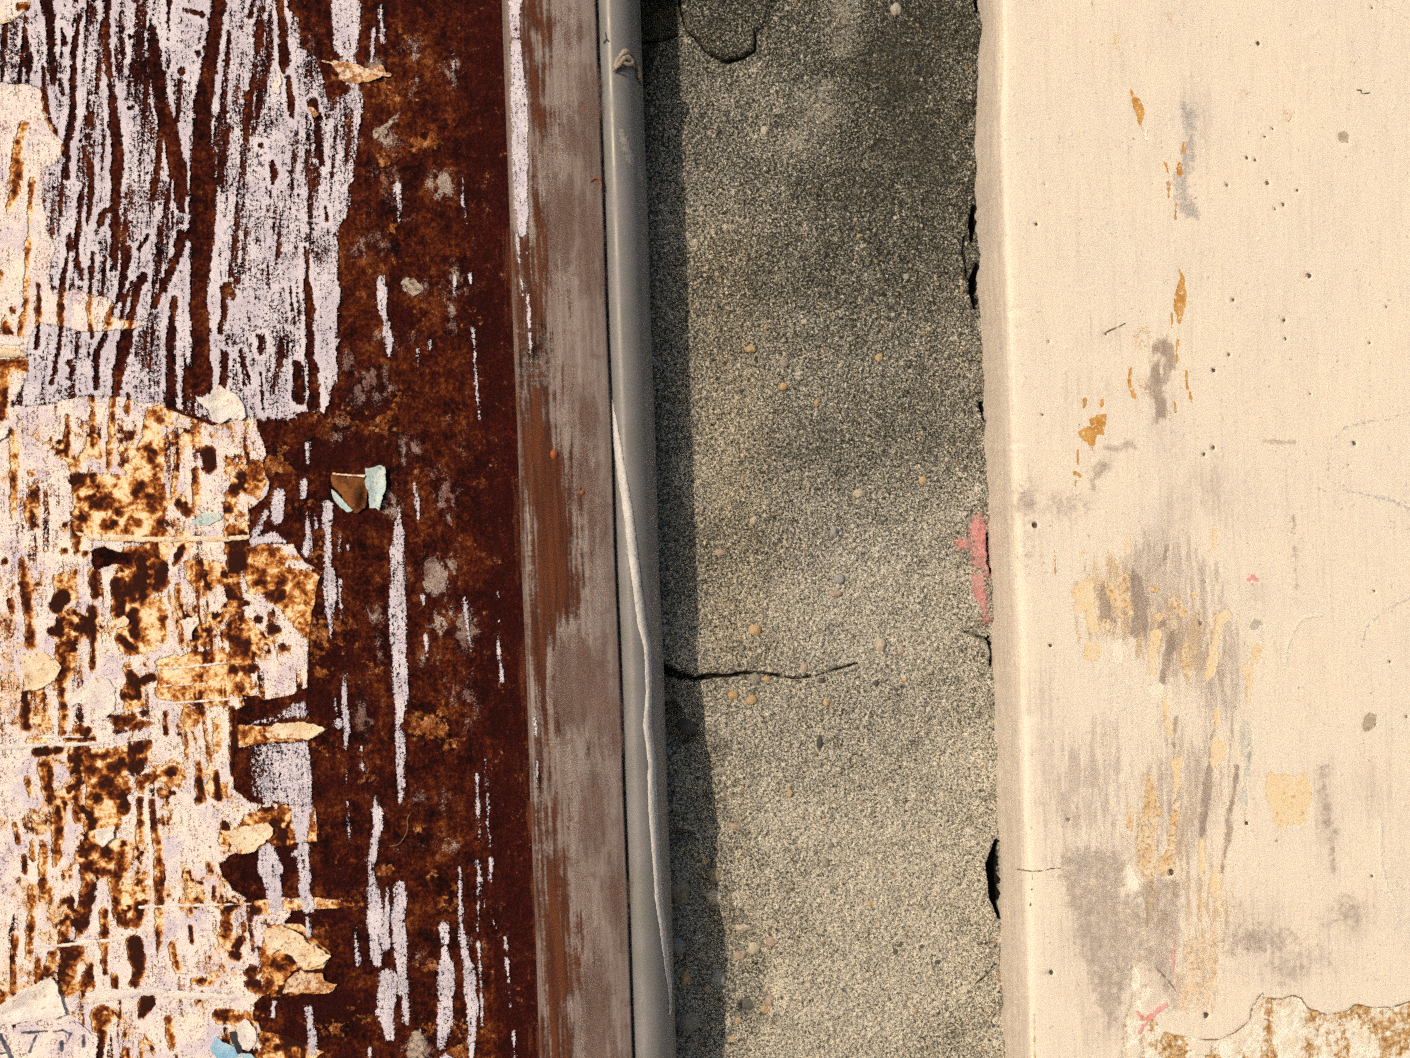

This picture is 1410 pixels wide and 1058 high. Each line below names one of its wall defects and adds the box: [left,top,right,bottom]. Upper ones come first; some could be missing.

peeling [331,0,385,64]
peeling [393,181,402,223]
peeling [376,275,394,357]
peeling [470,326,481,420]
peeling [0,0,366,1058]
peeling [365,465,386,510]
rust [497,0,624,1058]
peeling [388,483,429,803]
crack [664,663,858,680]
peeling [354,795,411,1058]
peeling [436,758,512,1058]
spalling [1120,964,1410,1058]